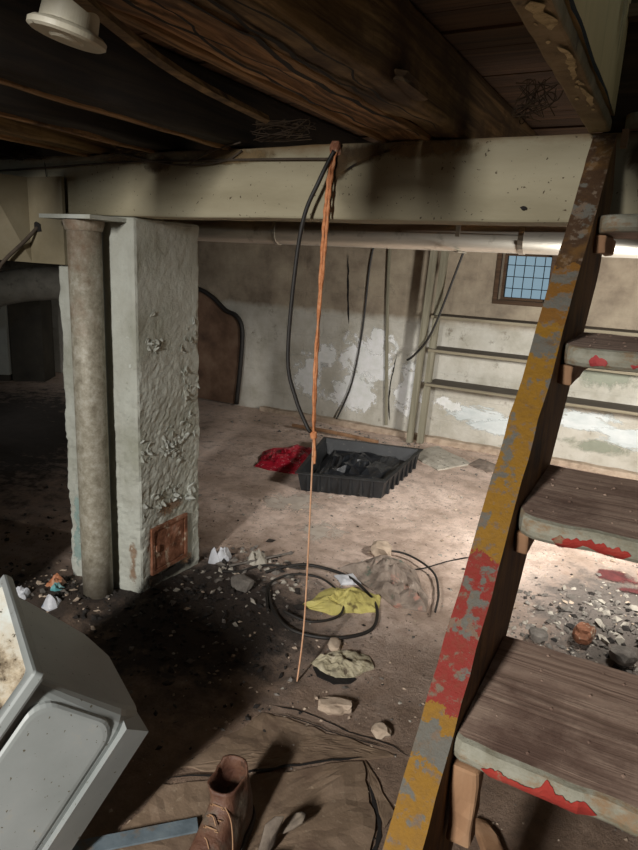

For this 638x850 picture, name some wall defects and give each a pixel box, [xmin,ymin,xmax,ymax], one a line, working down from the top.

peeling [525,1,558,30]
peeling [546,40,595,111]
peeling [140,365,200,467]
water stain [434,396,509,435]
water stain [561,408,638,453]
peeling [143,482,197,518]
rust [161,501,180,515]